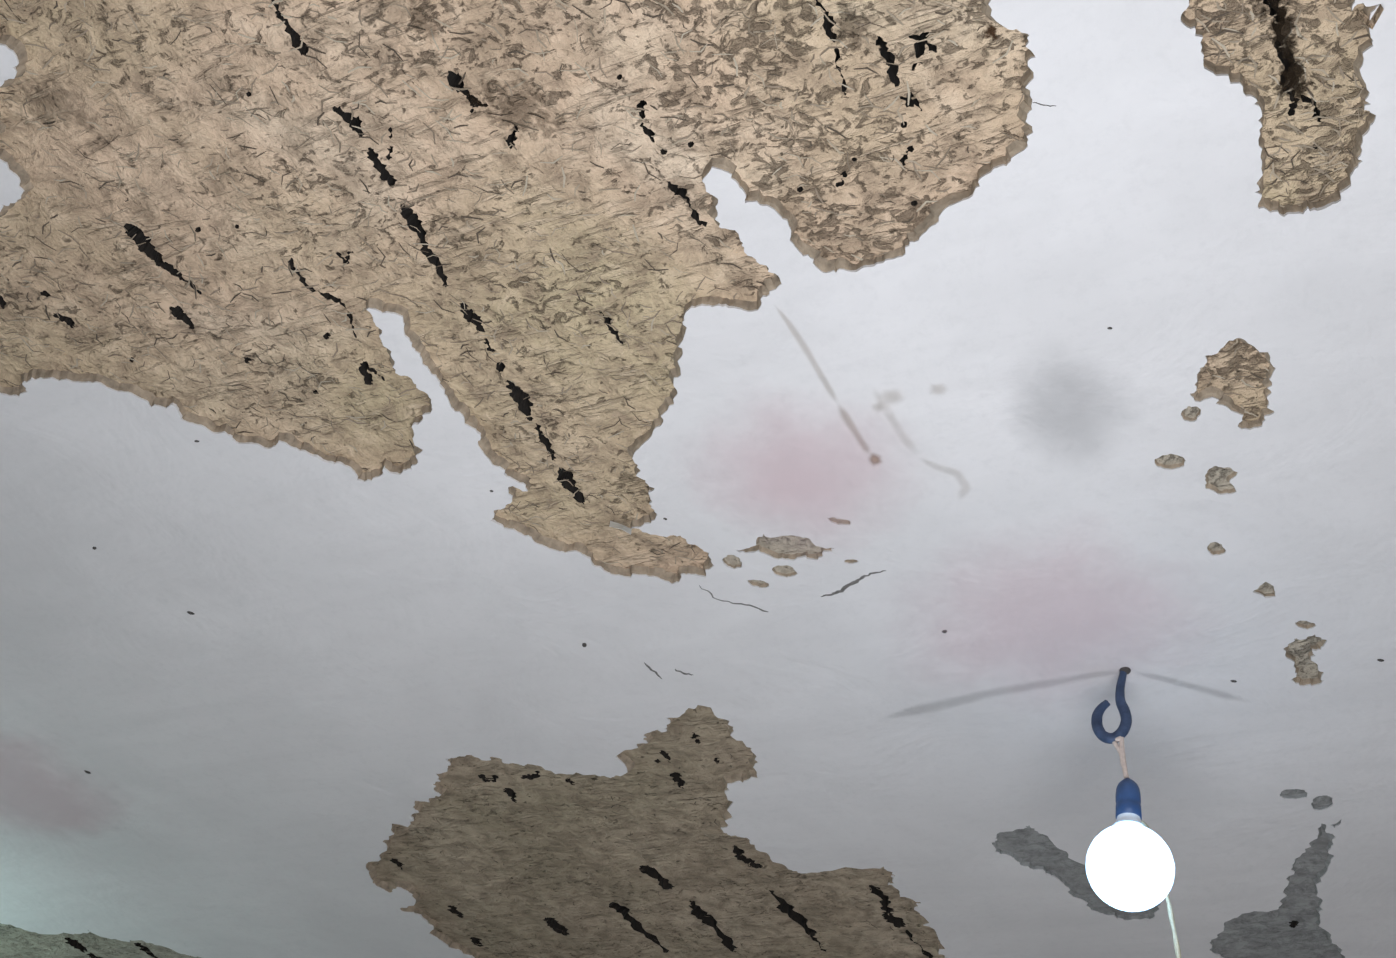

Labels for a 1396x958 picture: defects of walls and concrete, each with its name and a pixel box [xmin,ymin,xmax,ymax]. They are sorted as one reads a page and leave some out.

crack [271,0,309,57]
crack [447,71,488,113]
spalling [1181,0,1384,215]
crack [1263,0,1322,149]
crack [123,223,202,329]
crack [332,106,585,504]
spalling [0,0,1035,587]
spalling [1181,338,1275,429]
spalling [1284,621,1326,685]
spalling [366,705,945,958]
spalling [0,923,201,958]
crack [639,865,738,952]